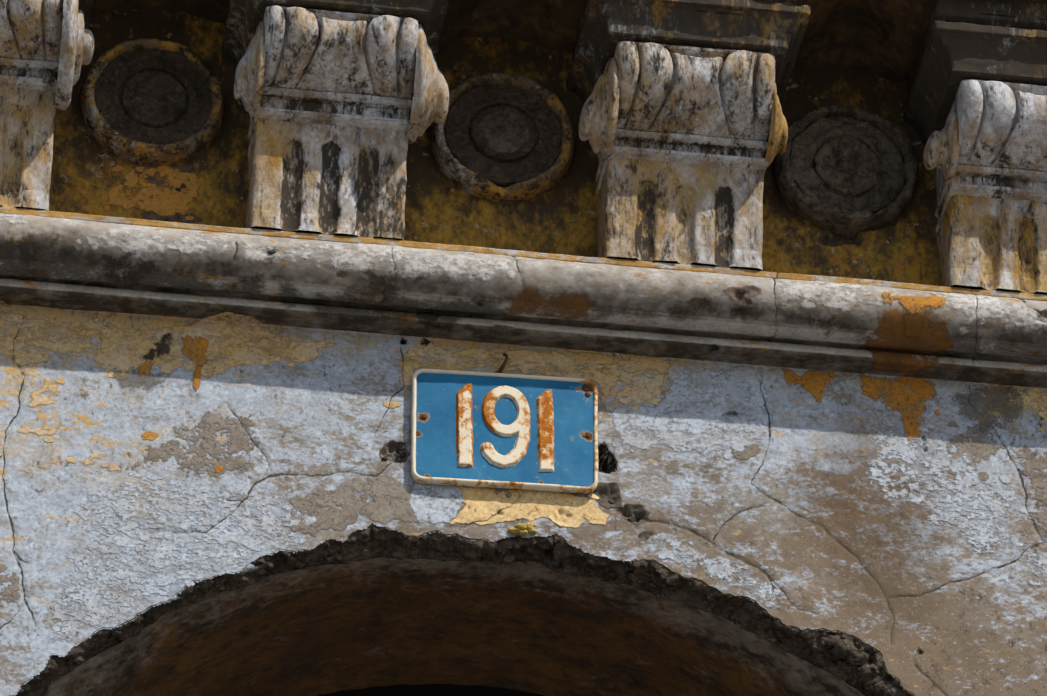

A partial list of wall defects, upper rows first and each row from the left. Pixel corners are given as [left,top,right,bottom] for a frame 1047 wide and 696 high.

peeling [76,164,230,259]
leakage [0,234,264,296]
peeling [0,301,336,379]
peeling [243,240,522,281]
leakage [276,276,507,333]
peeling [27,377,65,407]
crack [375,349,405,433]
peeling [383,342,773,460]
crack [0,317,36,629]
crack [151,404,399,533]
crack [610,366,1047,645]
spalling [13,411,915,696]